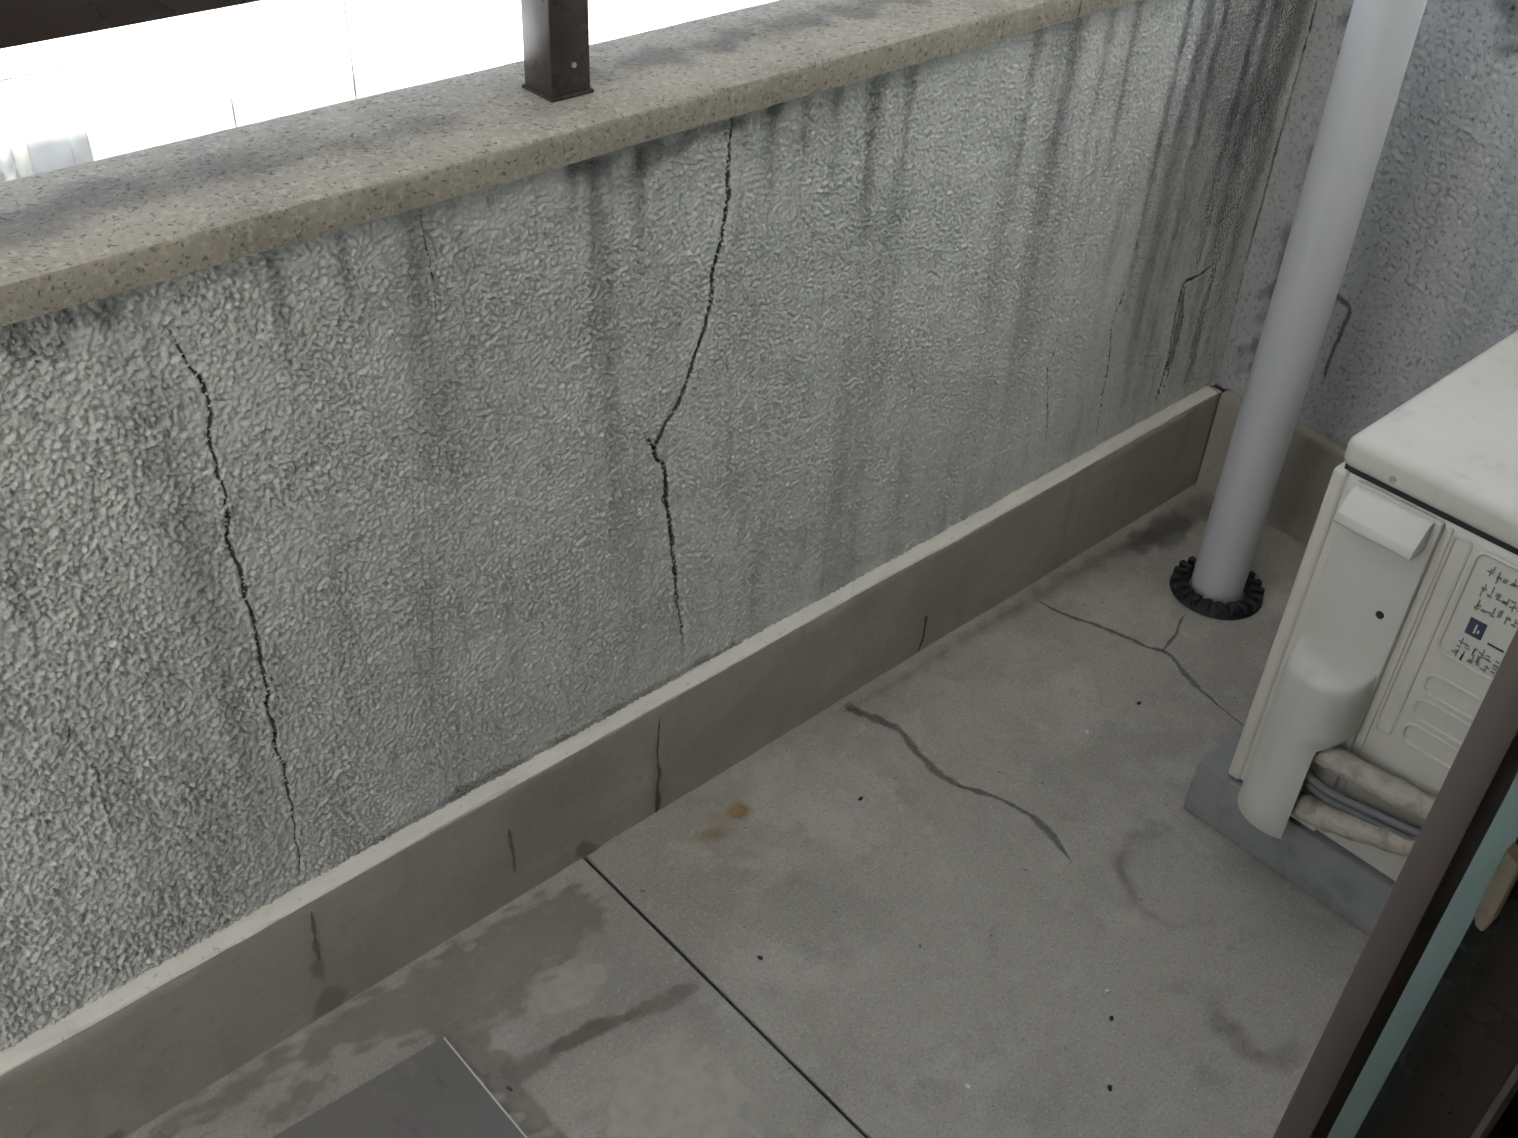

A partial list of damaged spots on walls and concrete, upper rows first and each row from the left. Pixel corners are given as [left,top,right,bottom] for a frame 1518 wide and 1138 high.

crack [174,339,300,871]
crack [646,132,732,642]
crack [851,708,1069,858]
crack [1046,605,1244,726]